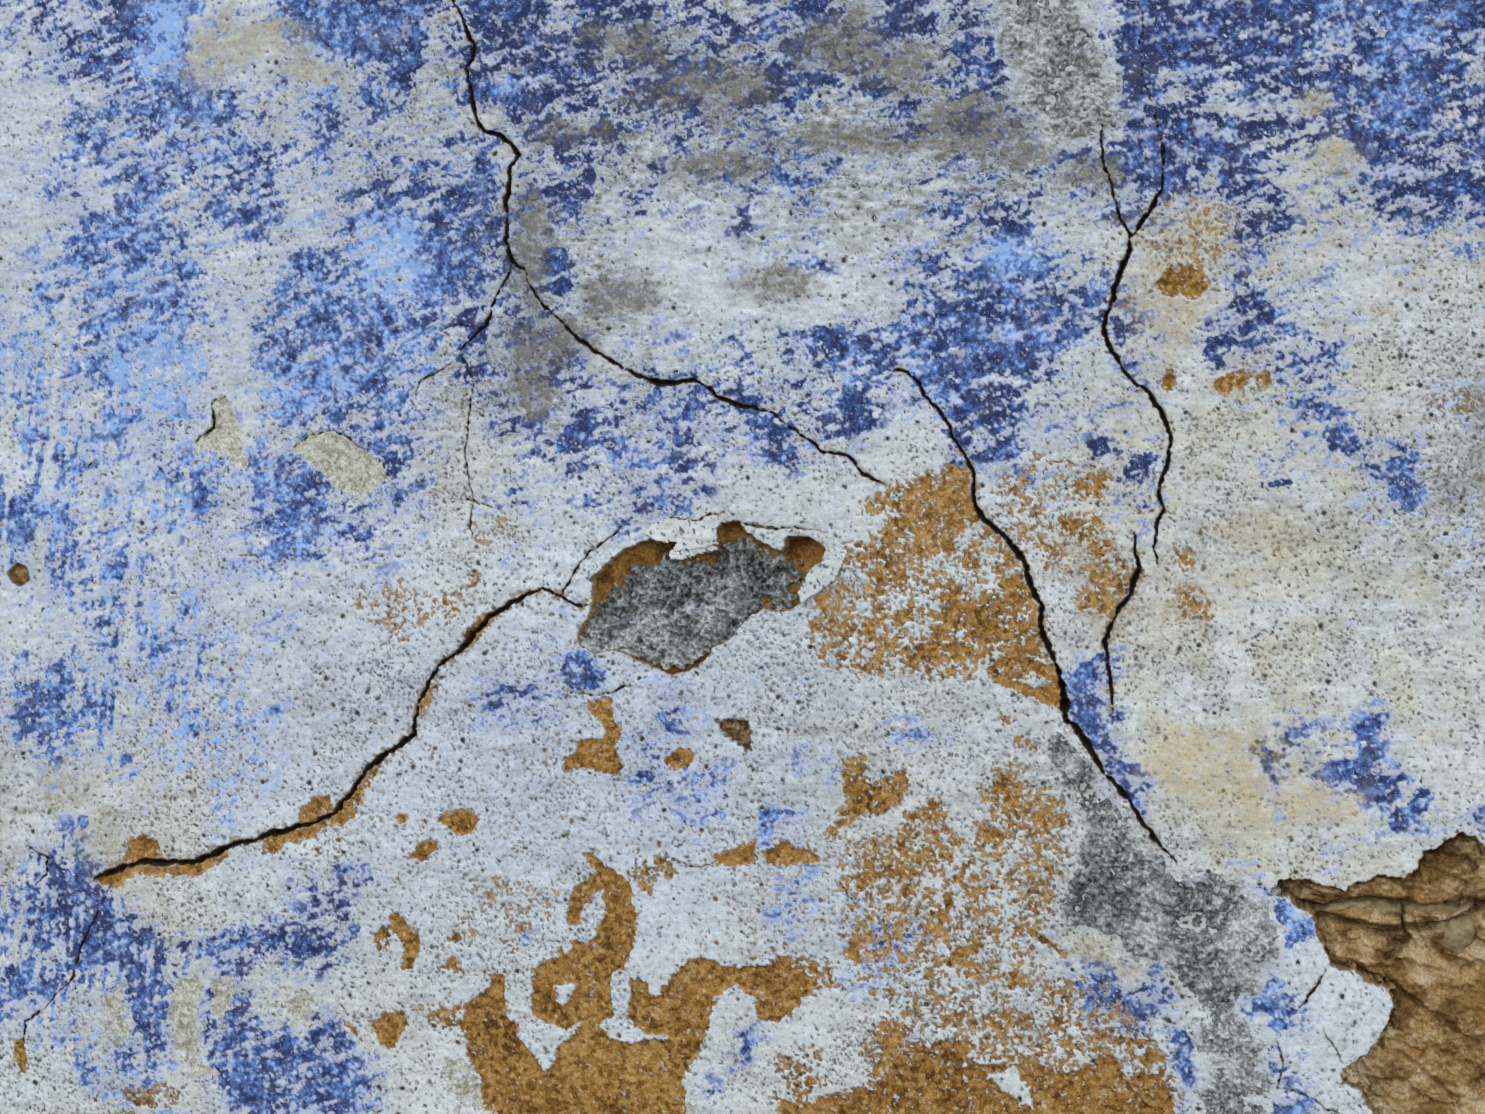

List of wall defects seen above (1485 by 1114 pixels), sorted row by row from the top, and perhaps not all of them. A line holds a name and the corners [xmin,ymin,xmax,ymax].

peeling [0,812,420,1114]
crack [23,528,620,1038]
flaking render [407,808,480,862]
crack [415,0,881,536]
peeling [0,0,1485,848]
crack [888,369,1176,861]
crack [1100,25,1172,710]
spalling [1219,697,1485,1114]